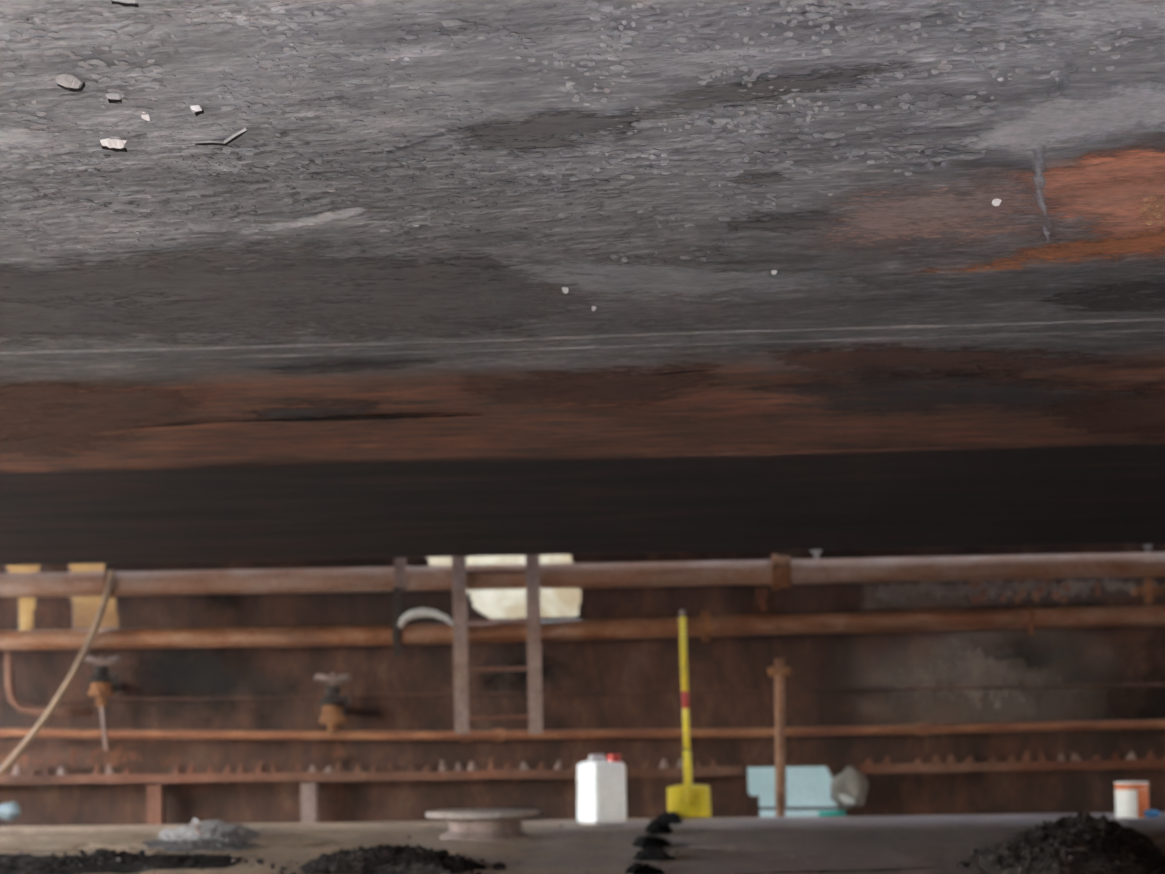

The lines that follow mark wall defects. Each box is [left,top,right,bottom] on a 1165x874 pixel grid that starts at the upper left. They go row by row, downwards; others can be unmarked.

peeling [0,0,1165,265]
water stain [457,62,910,153]
corrosion [814,149,1165,272]